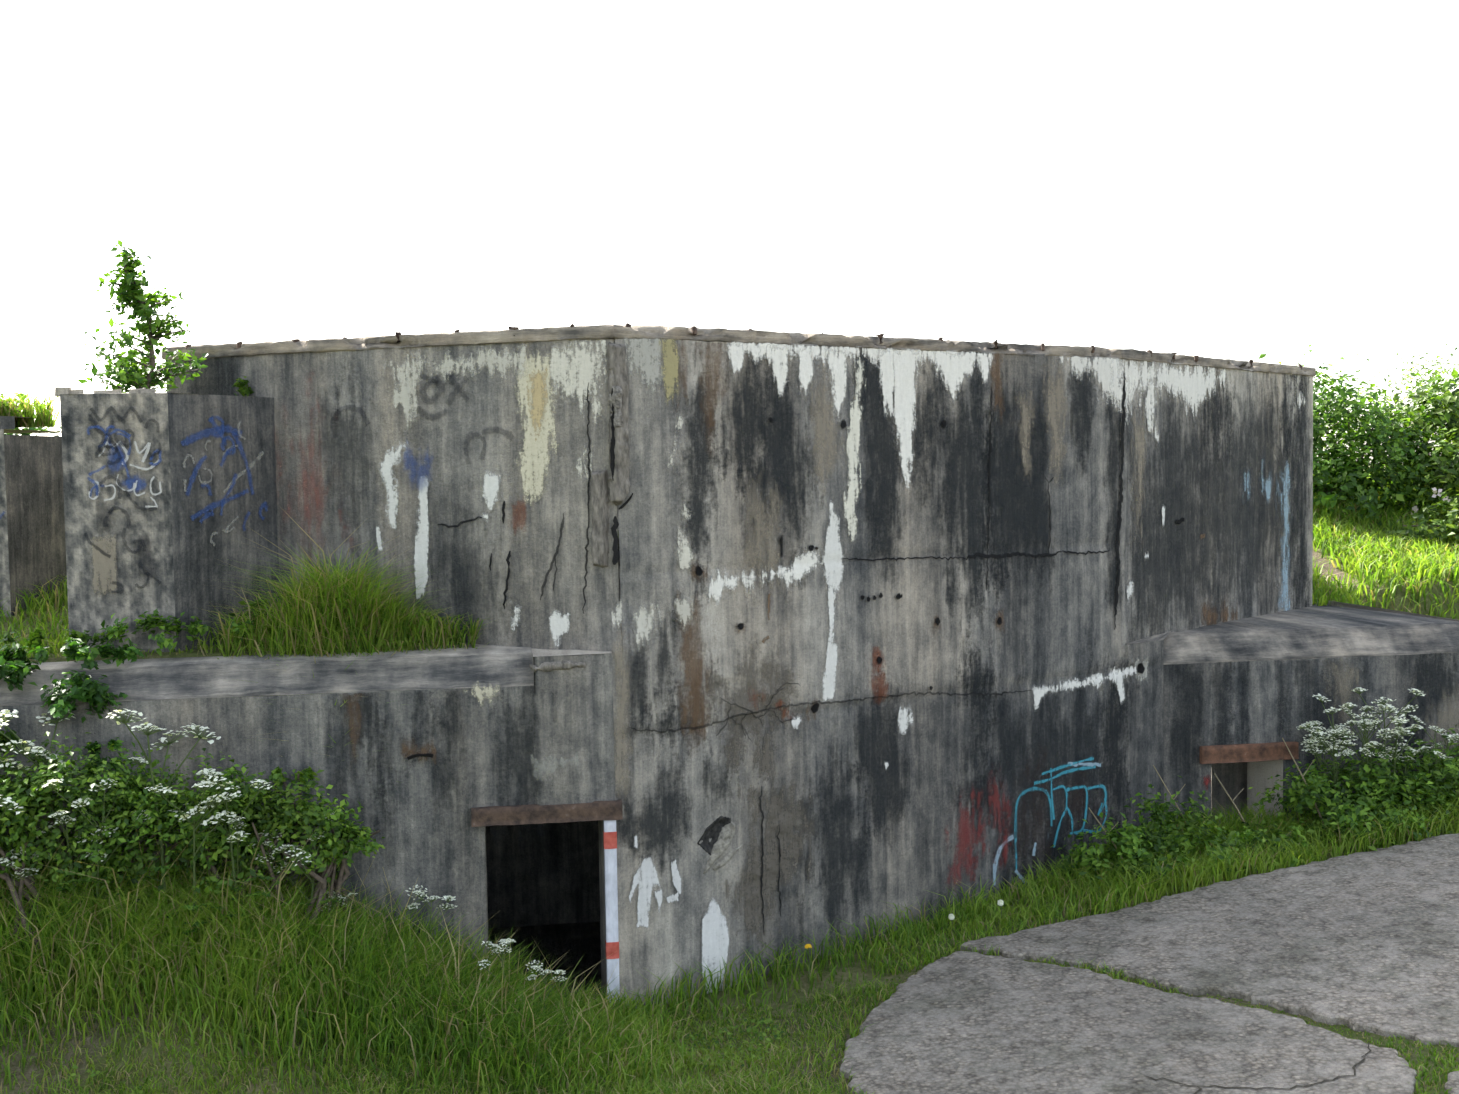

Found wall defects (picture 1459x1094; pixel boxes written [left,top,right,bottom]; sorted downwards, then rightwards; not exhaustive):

damp [376,340,608,550]
crack [437,382,633,614]
damp [549,611,570,646]
damp [612,338,1055,735]
damp [1060,356,1311,638]
damp [617,770,692,869]
spalling [697,642,814,954]
damp [800,685,913,929]
damp [959,654,1137,889]
crack [1146,1041,1372,1094]